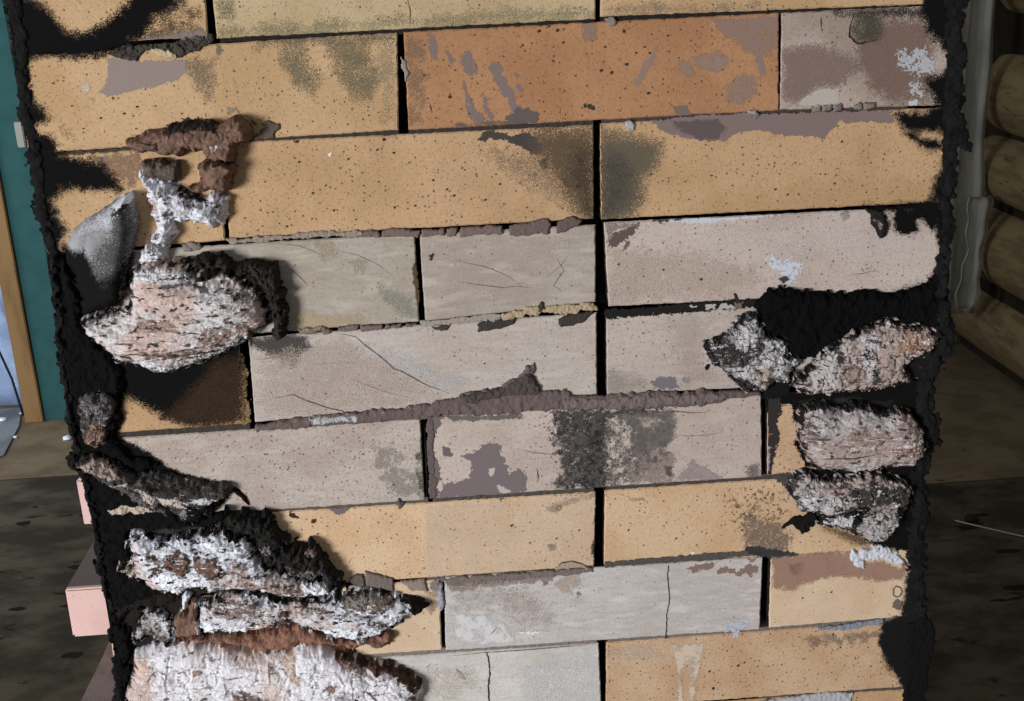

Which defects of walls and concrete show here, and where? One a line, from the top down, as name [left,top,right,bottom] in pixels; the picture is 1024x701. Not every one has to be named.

efflorescence [894,45,939,106]
spalling [488,467,510,502]
leakage [796,491,908,569]
crack [663,566,671,639]
crack [456,628,590,701]